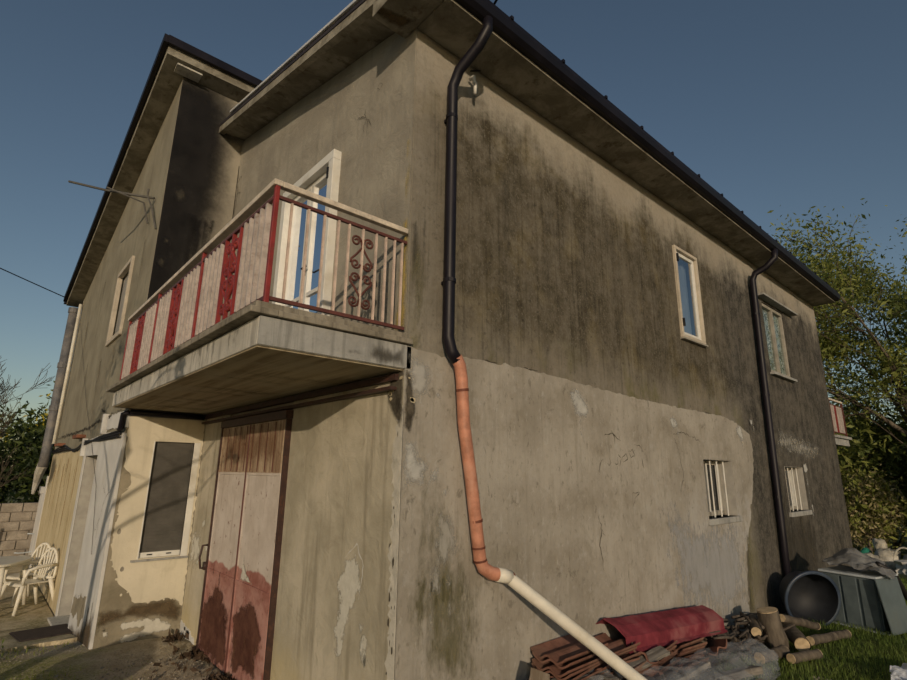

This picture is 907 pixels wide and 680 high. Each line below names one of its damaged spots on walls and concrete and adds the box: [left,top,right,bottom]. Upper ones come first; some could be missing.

damp [147,78,229,305]
peeling [70,595,87,627]
flaking render [92,425,194,649]
peeling [334,543,363,656]
spalling [374,349,416,680]
damp [778,434,816,457]